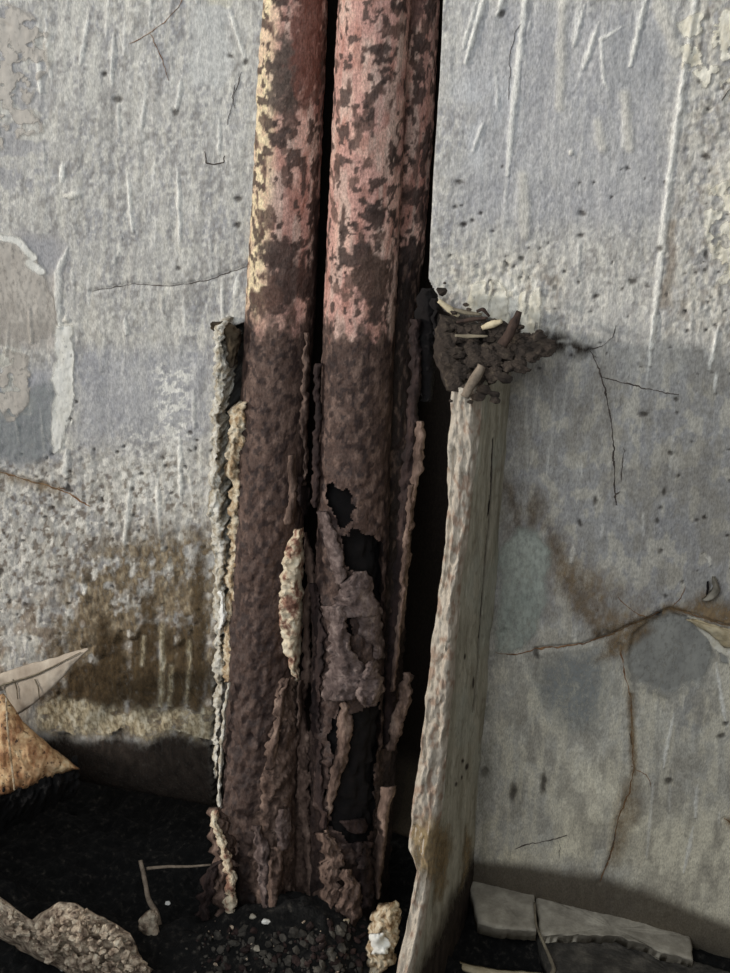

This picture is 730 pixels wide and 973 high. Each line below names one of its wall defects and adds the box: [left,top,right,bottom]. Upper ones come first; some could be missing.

peeling [0,235,75,453]
crack [0,472,90,507]
crack [94,267,244,291]
flaking render [467,281,541,334]
crack [589,327,679,505]
water stain [37,529,216,745]
rust [194,288,440,973]
crack [478,585,730,881]
spalling [626,610,730,696]
rust [411,820,451,900]